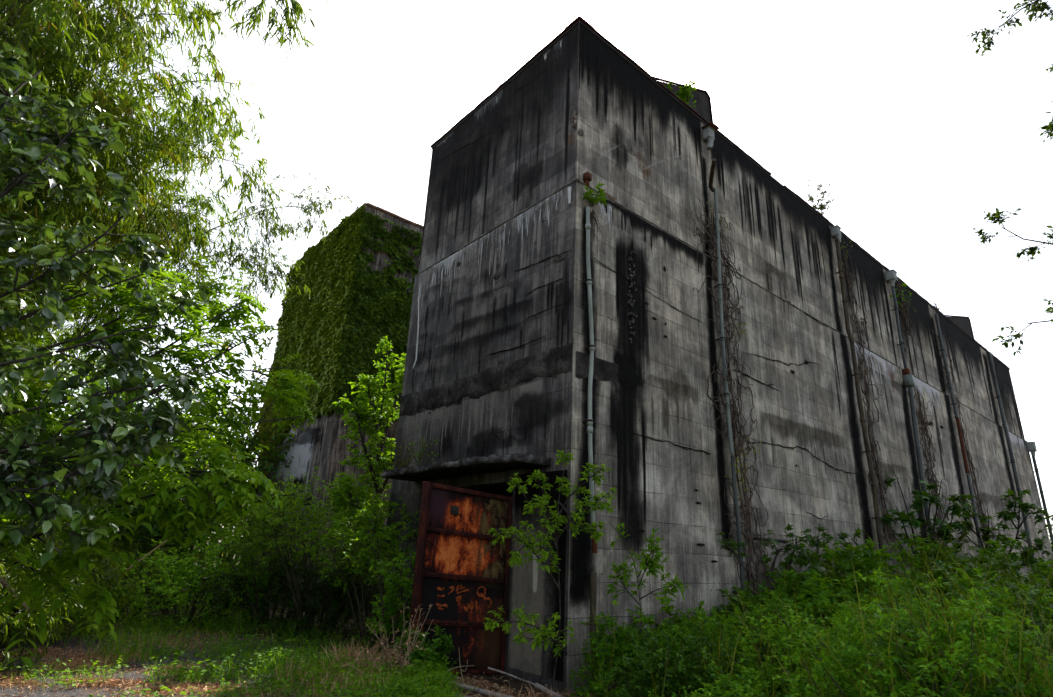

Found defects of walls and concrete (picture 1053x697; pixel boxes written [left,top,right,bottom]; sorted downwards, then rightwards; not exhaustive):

water stain [404,22,1033,605]
crack [629,432,711,454]
crack [750,442,856,477]